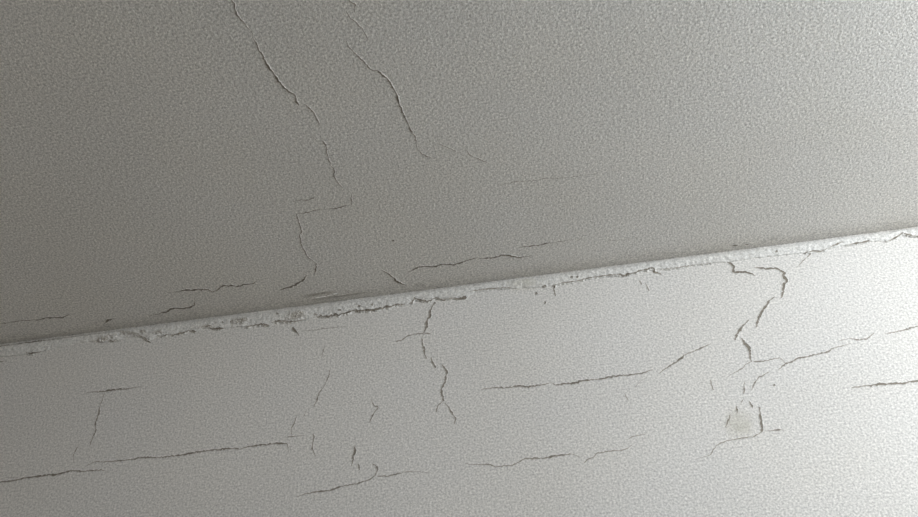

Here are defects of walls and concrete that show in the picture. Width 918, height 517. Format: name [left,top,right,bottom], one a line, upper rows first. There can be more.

crack [231,0,353,290]
crack [346,0,489,164]
crack [0,235,584,484]
crack [297,445,431,497]
crack [465,434,646,468]
crack [481,343,711,401]
crack [552,232,918,460]